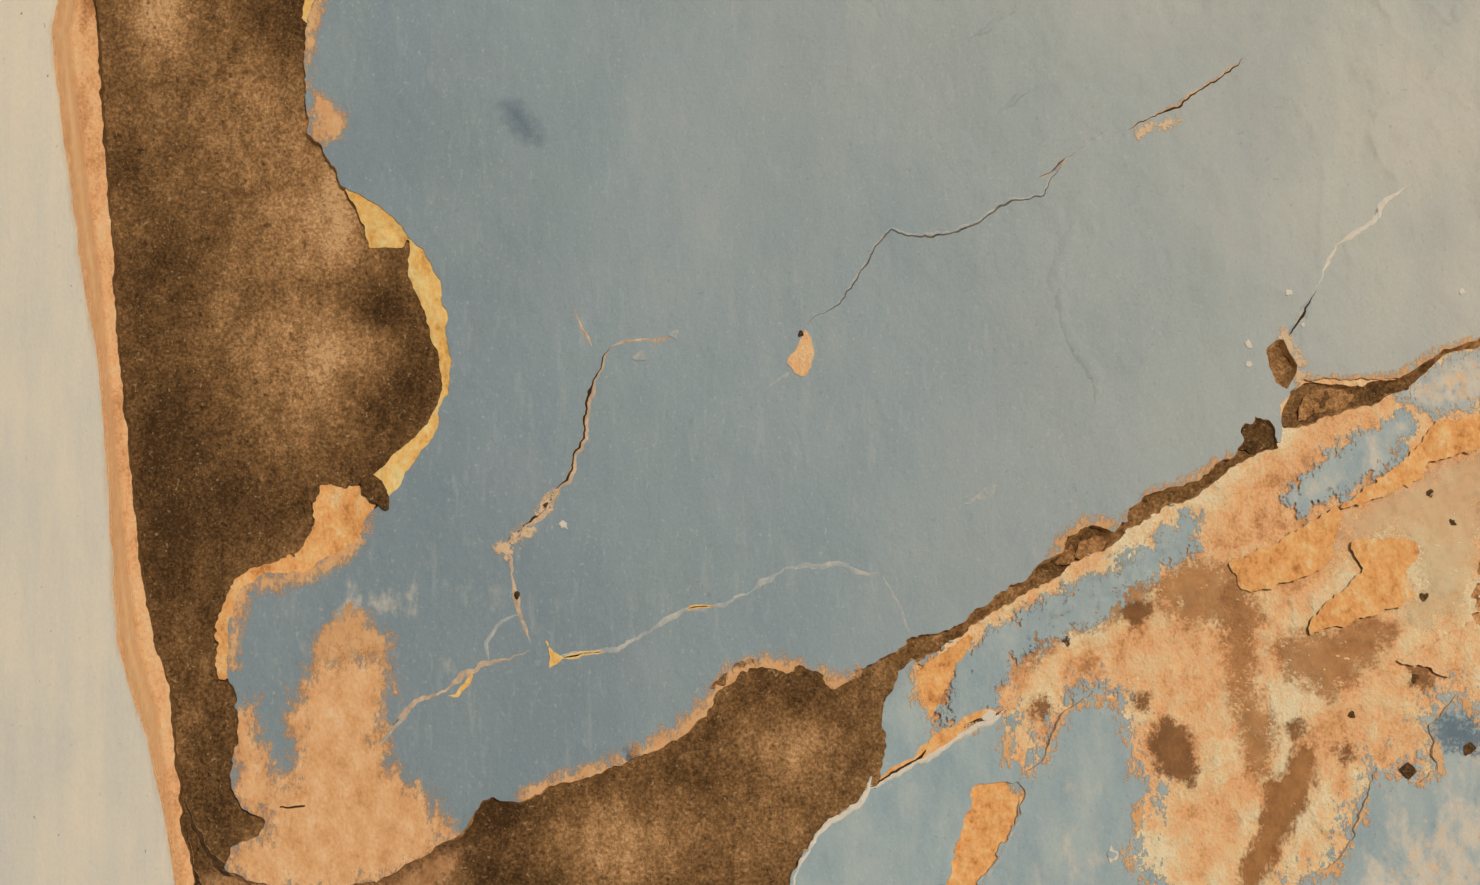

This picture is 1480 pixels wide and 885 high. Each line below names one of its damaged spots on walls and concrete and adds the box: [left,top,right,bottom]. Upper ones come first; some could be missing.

spalling [96,0,898,885]
crack [379,185,1480,745]
crack [766,58,1243,483]
peeling [907,341,1480,885]